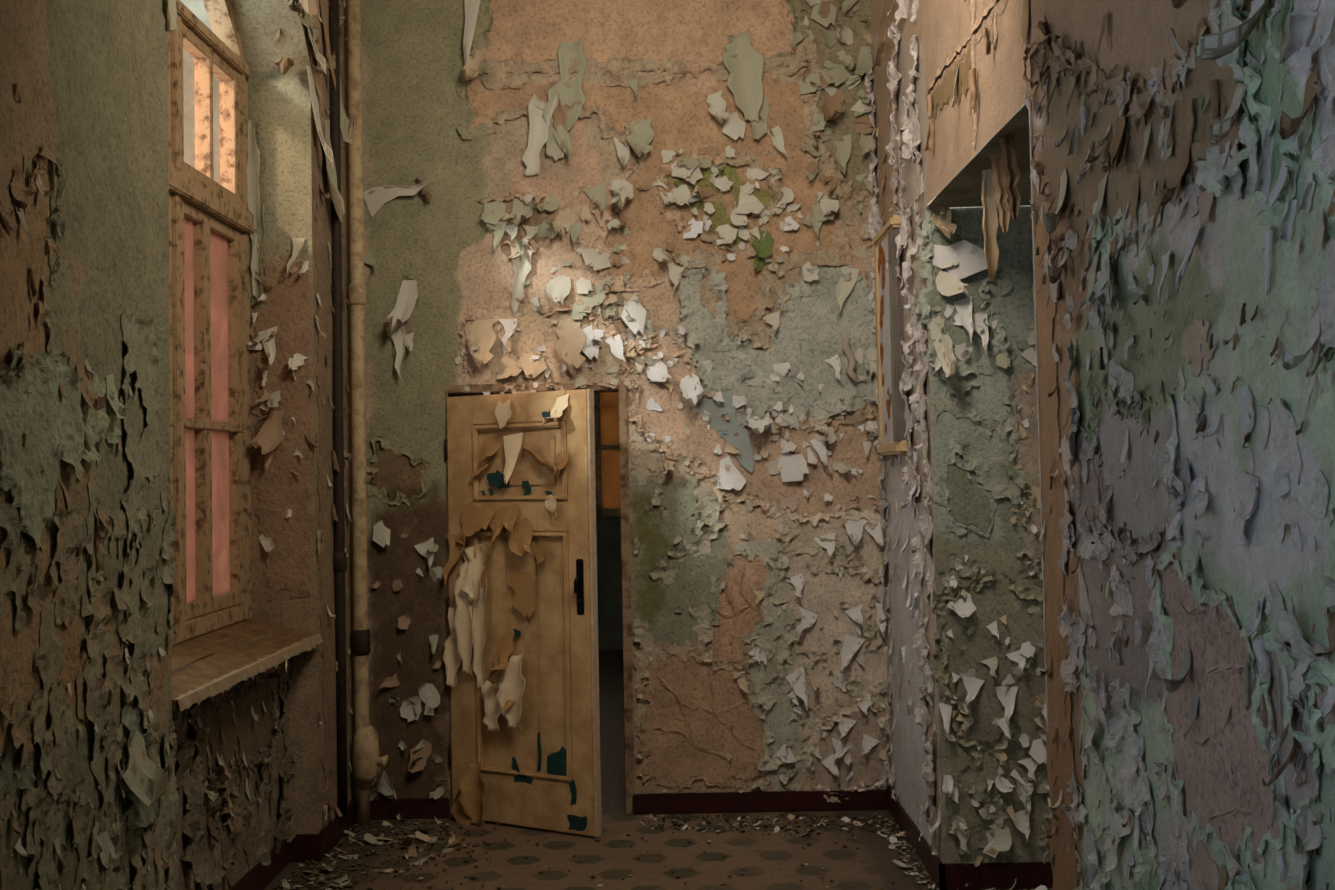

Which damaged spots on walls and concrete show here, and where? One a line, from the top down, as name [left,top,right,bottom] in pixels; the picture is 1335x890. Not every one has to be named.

crack [915,0,1007,201]
peeling [70,355,134,419]
flaking render [247,0,434,827]
peeling [0,805,31,858]
peeling [88,781,123,874]
peeling [188,671,280,843]
spalling [398,739,472,825]